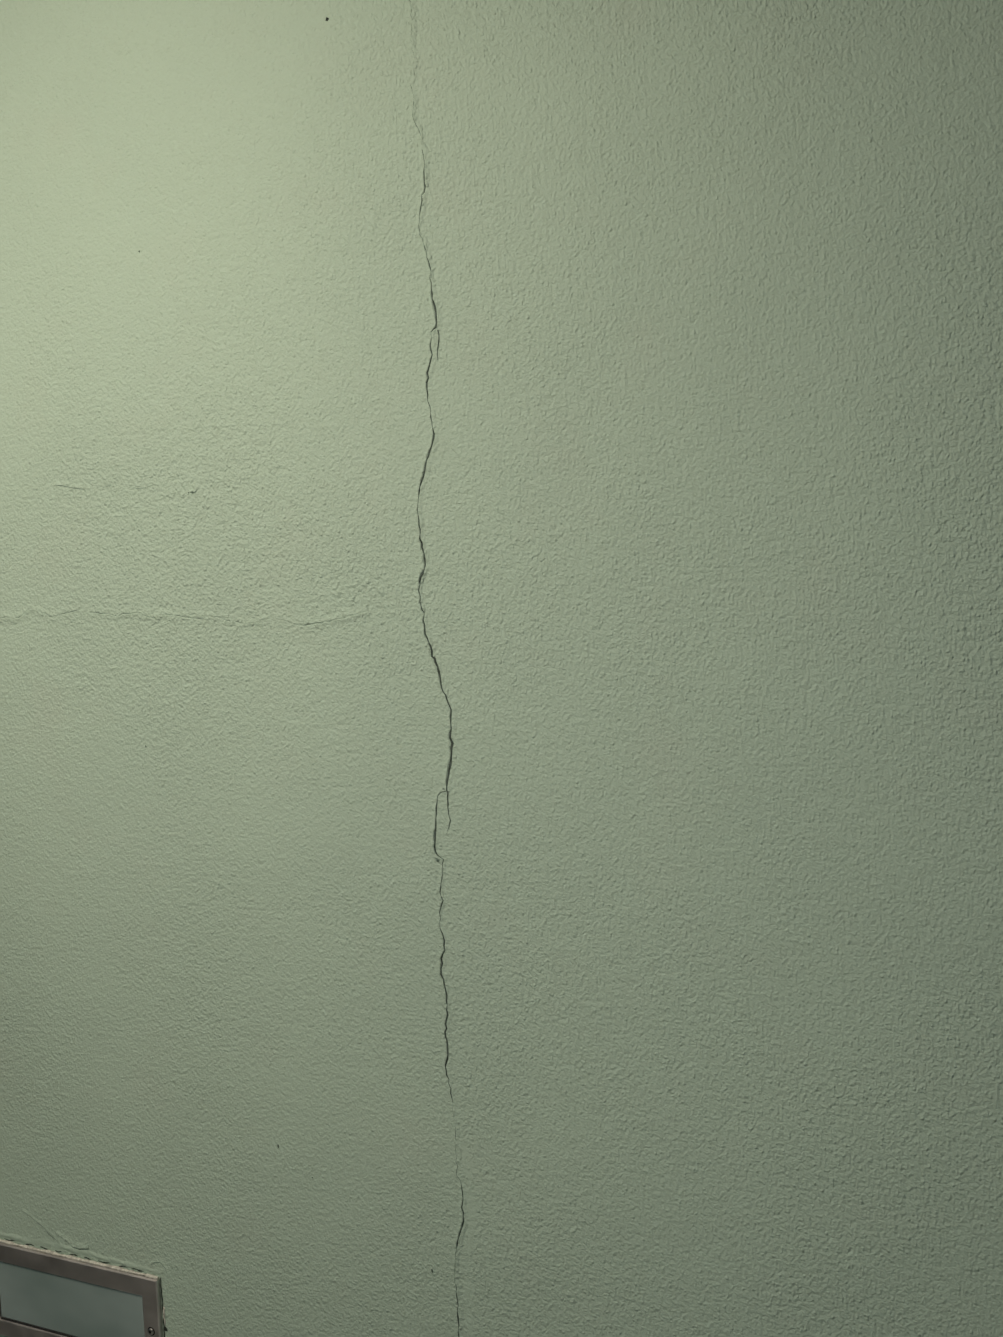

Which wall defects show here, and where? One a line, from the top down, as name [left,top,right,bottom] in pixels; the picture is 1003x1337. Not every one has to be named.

crack [402,0,469,1337]